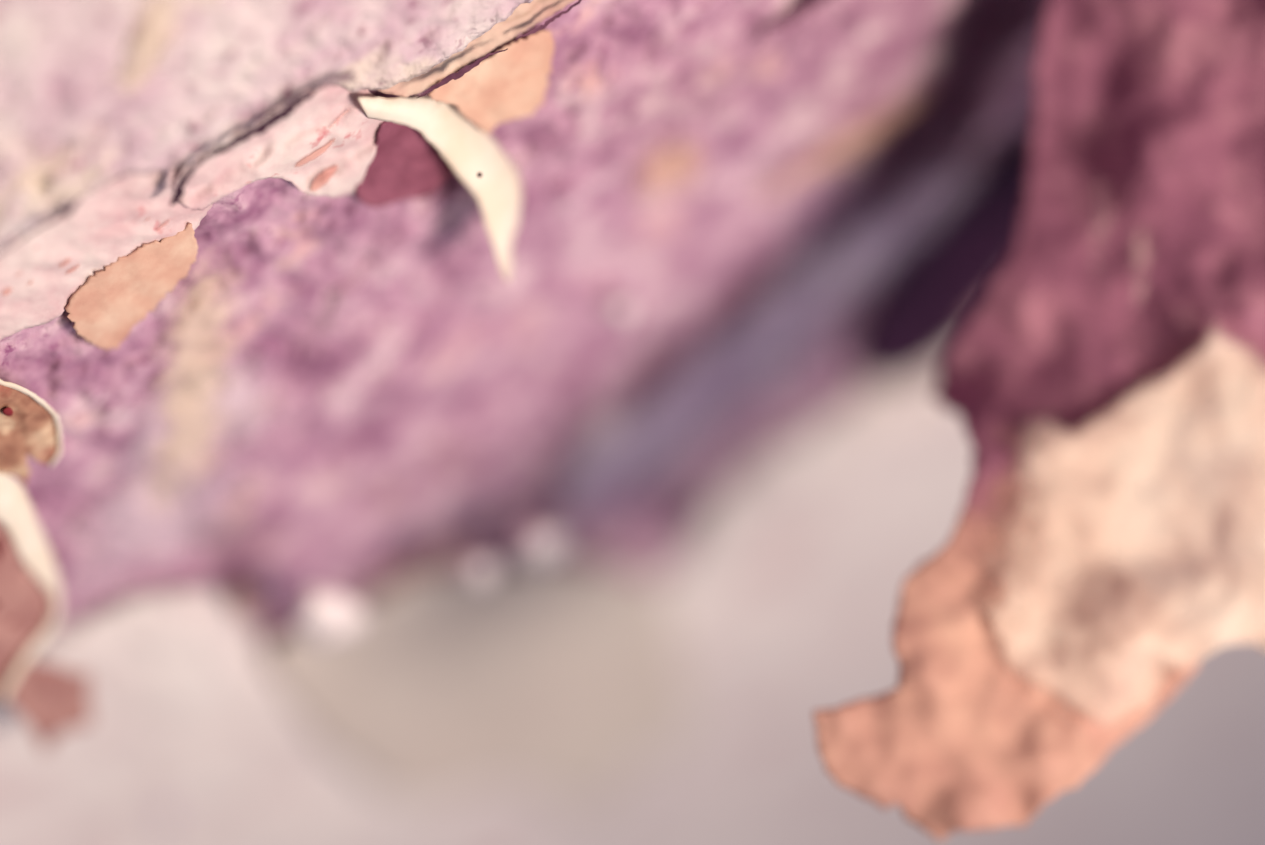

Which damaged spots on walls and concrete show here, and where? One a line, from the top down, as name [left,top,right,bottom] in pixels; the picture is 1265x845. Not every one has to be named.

peeling [0,0,575,351]
peeling [0,379,93,753]
peeling [813,0,1265,842]